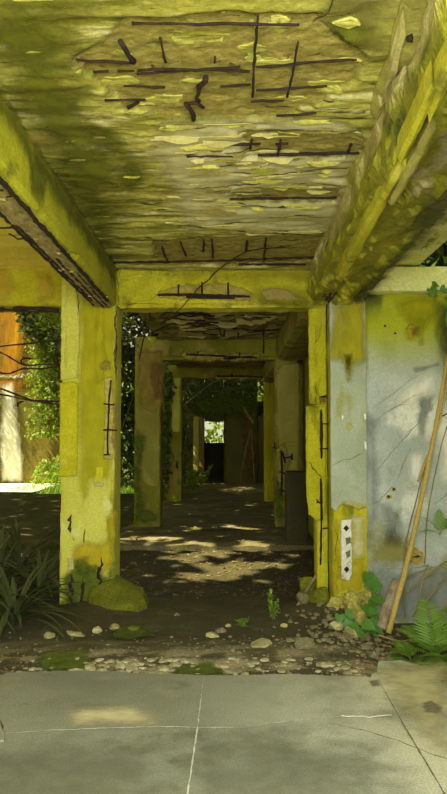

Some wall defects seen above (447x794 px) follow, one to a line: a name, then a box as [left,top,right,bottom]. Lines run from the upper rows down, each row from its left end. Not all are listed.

peeling [335,38,447,283]
spalling [0,10,366,487]
peeling [273,292,367,565]
damp [411,455,422,485]
damp [403,367,432,434]
damp [438,420,447,479]
damp [333,498,375,591]
spalling [410,547,424,565]
damp [375,569,447,622]
crack [0,715,447,759]